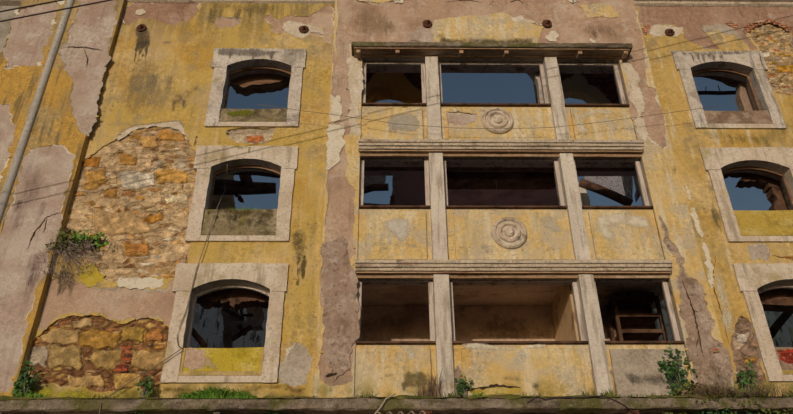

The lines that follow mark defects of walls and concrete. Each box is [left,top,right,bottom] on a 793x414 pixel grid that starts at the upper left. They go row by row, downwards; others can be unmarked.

peeling [2,2,59,69]
peeling [58,0,200,136]
peeling [0,104,16,174]
peeling [263,0,793,390]
flaking render [0,125,197,393]
leakage [293,233,306,285]
peeling [183,347,206,371]